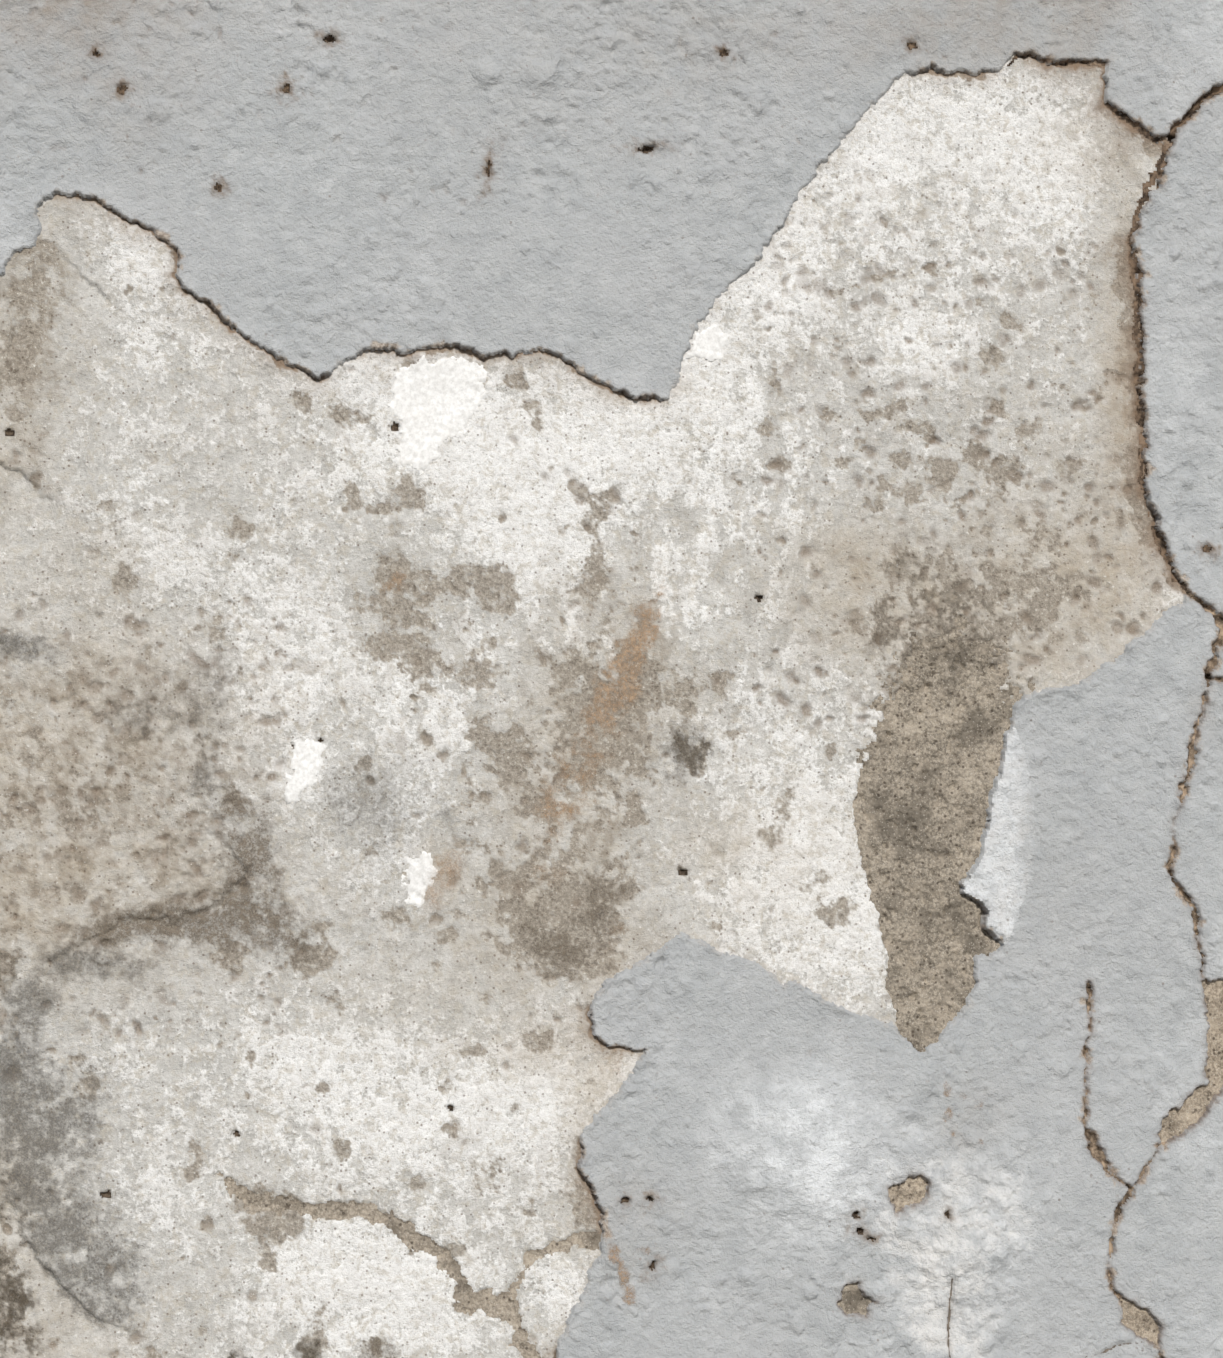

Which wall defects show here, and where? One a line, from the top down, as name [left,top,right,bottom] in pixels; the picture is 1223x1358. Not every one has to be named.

crack [1007,54,1106,67]
peeling [684,324,729,362]
peeling [389,355,487,472]
crack [1106,84,1223,803]
peeling [284,738,326,805]
peeling [401,851,438,908]
flaking render [852,615,1023,1052]
peeling [962,726,1038,942]
crack [1166,846,1207,982]
crack [1082,982,1165,1311]
flaking render [224,1177,601,1358]
crack [1085,1340,1163,1358]